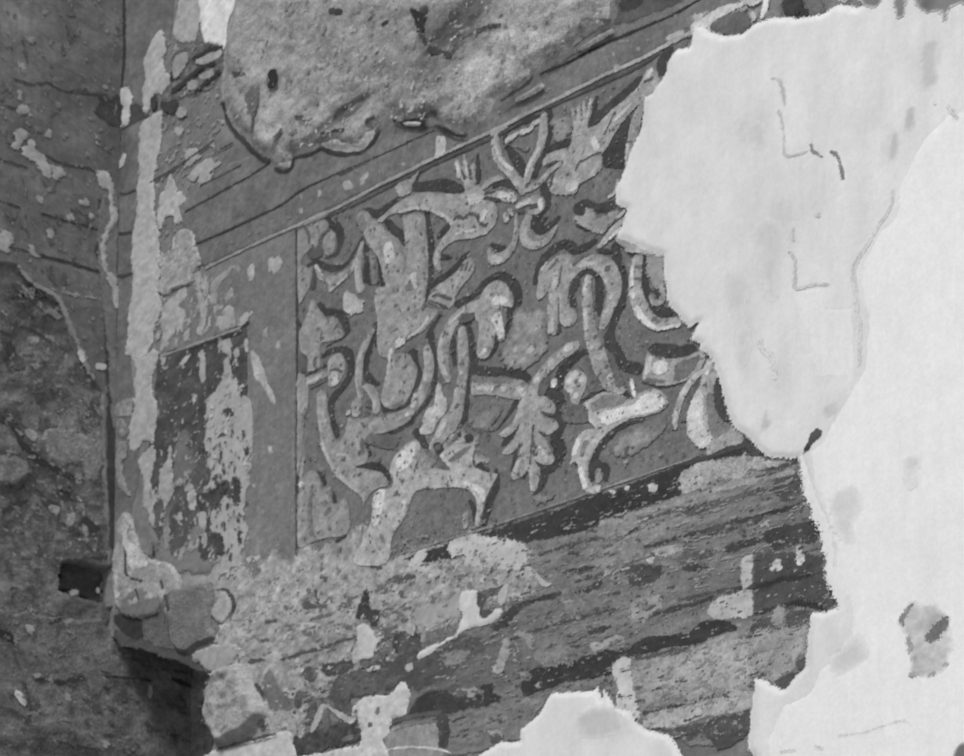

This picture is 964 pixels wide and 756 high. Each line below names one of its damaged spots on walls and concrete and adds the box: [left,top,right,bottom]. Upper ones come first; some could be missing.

peeling [549,113,574,142]
crack [771,77,845,180]
crack [933,101,959,120]
spalling [0,0,256,624]
peeling [268,255,283,274]
crack [788,188,895,366]
flaking render [610,0,964,756]
peeling [405,548,430,573]
peeling [447,530,528,571]
peeling [190,584,508,756]
flaking render [479,686,683,756]